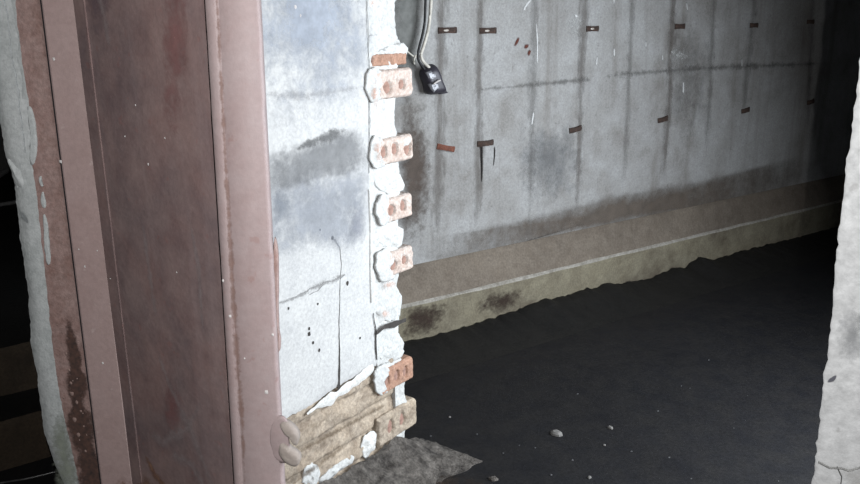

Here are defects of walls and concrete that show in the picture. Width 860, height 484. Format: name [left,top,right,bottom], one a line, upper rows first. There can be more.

spalling [285,0,416,484]
damp [402,121,427,223]
damp [489,170,777,244]
damp [405,305,441,334]
damp [484,292,517,310]
corrosion [66,321,100,484]
crack [818,461,860,484]